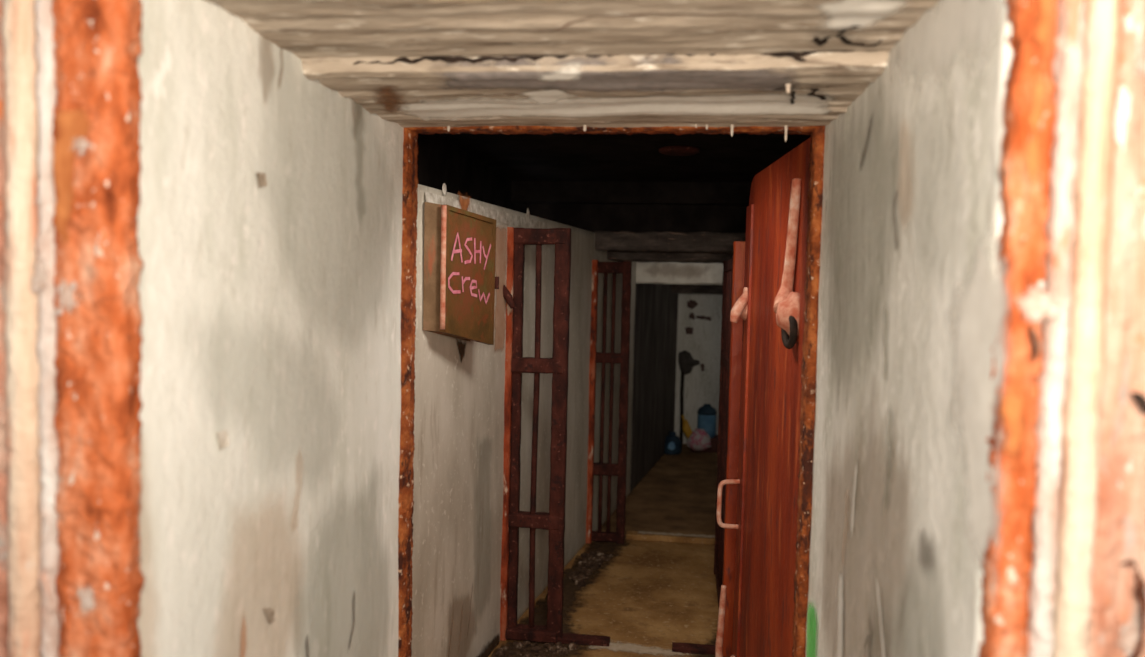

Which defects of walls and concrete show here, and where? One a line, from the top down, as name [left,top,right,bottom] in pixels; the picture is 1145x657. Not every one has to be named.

crack [353,12,760,65]
crack [648,26,882,61]
crack [769,87,835,105]
corrosion [54,110,90,242]
corrosion [1003,396,1024,454]